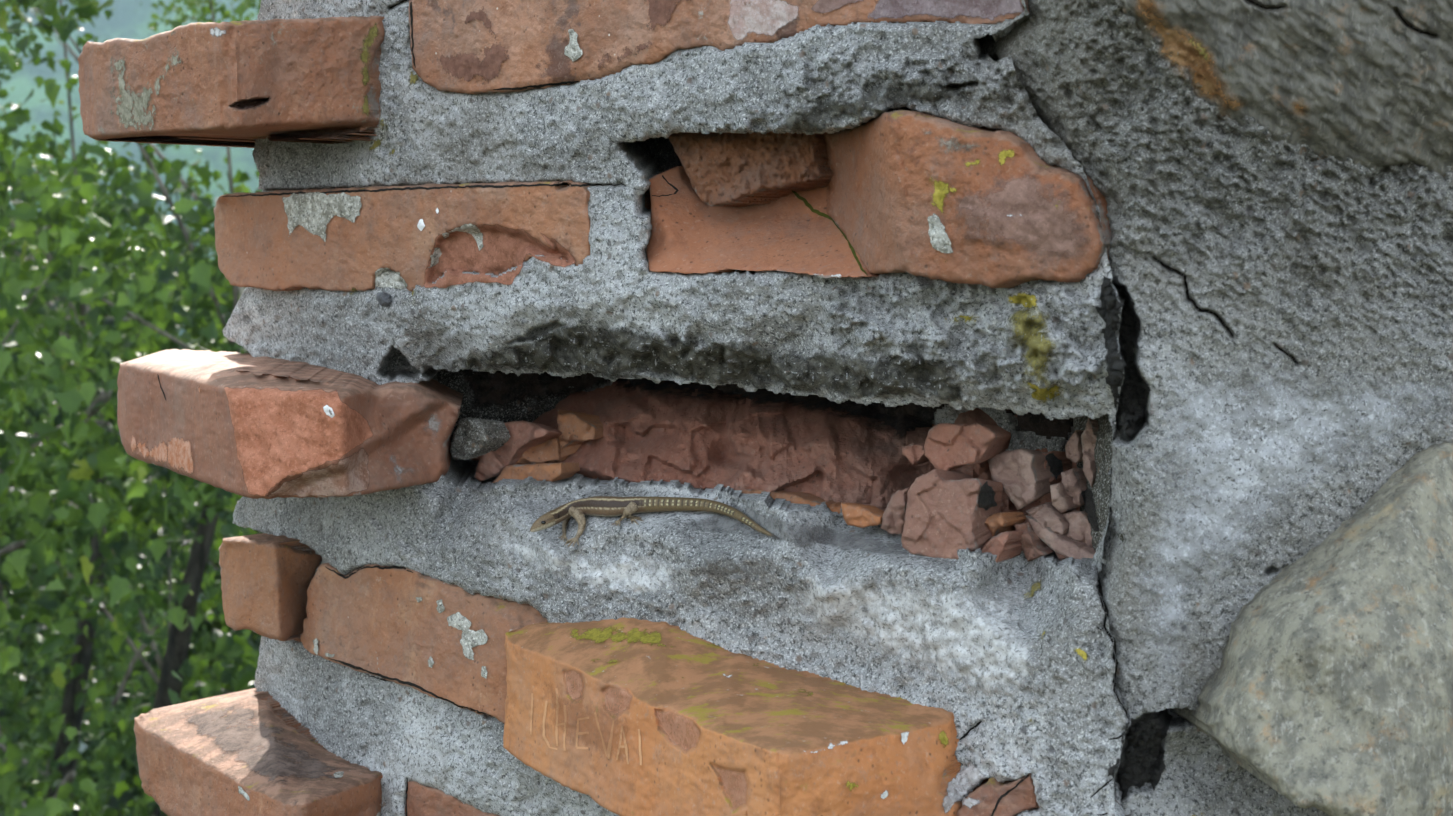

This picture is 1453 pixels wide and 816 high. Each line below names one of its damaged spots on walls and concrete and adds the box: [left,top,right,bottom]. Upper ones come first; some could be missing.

crack [1247,0,1285,9]
crack [1396,9,1434,36]
spalling [646,82,965,278]
crack [1154,258,1233,336]
crack [1274,344,1298,364]
crack [1097,569,1130,740]
crack [1091,779,1113,816]